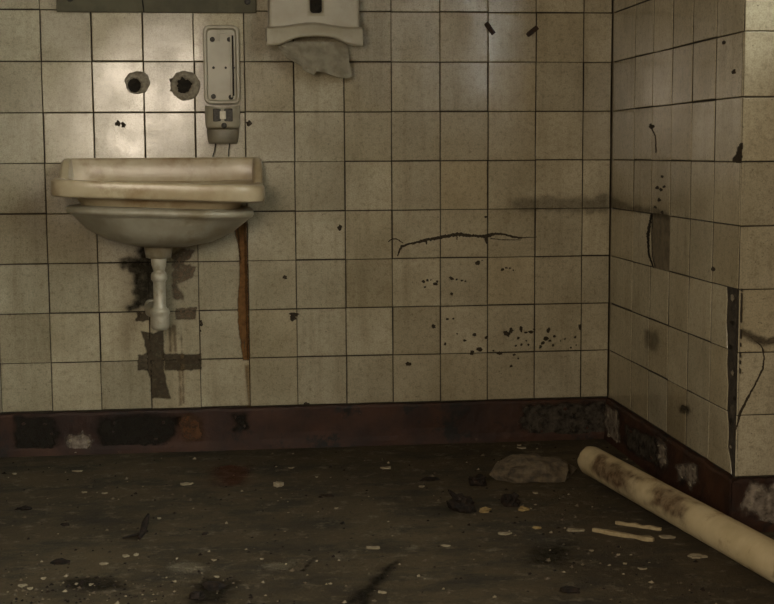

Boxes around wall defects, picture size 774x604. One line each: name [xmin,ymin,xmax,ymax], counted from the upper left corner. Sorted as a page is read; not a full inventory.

crack [388,232,534,256]
spalling [646,175,672,272]
rust [235,222,250,384]
spalling [727,286,742,463]
peeling [14,414,180,453]
crack [344,562,397,604]